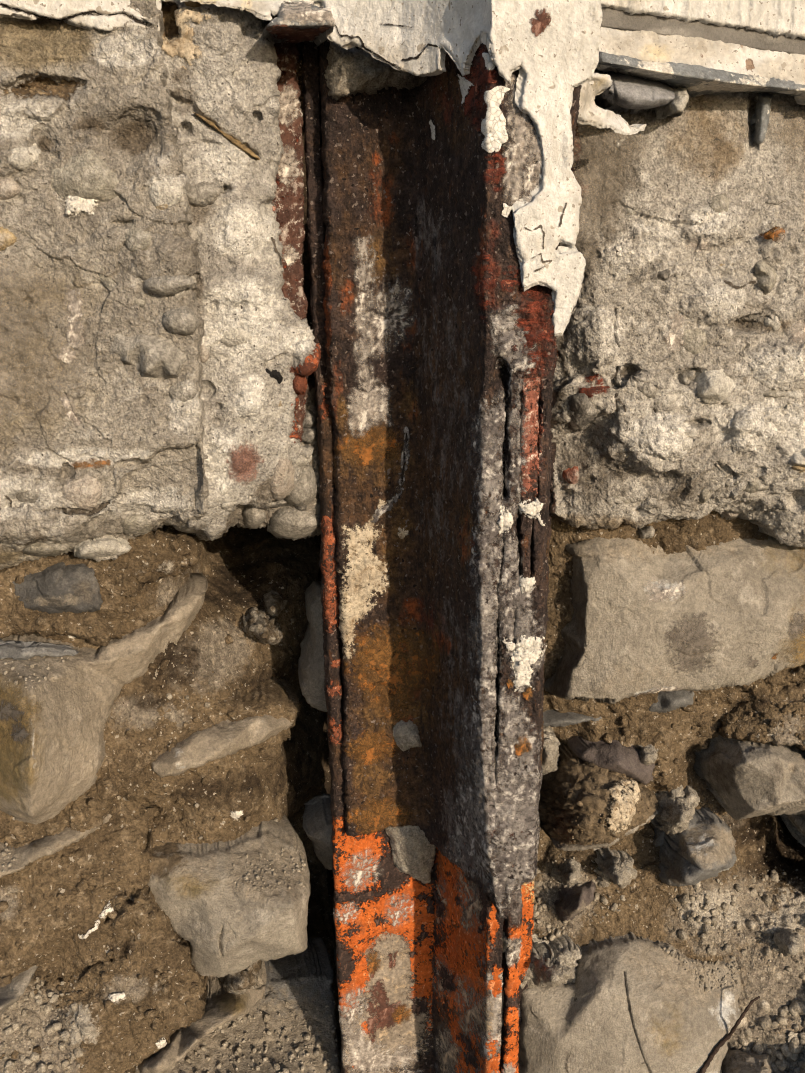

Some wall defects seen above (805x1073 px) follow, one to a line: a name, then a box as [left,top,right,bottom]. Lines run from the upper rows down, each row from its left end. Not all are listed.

peeling [458,74,473,104]
rust [461,44,497,131]
peeling [482,53,495,70]
peeling [481,75,543,217]
peeling [577,73,646,148]
rust [471,250,558,499]
rust [335,427,403,465]
water stain [337,499,390,659]
crack [500,538,519,596]
rust [343,623,441,722]
rust [514,738,531,756]
rust [333,848,460,1042]